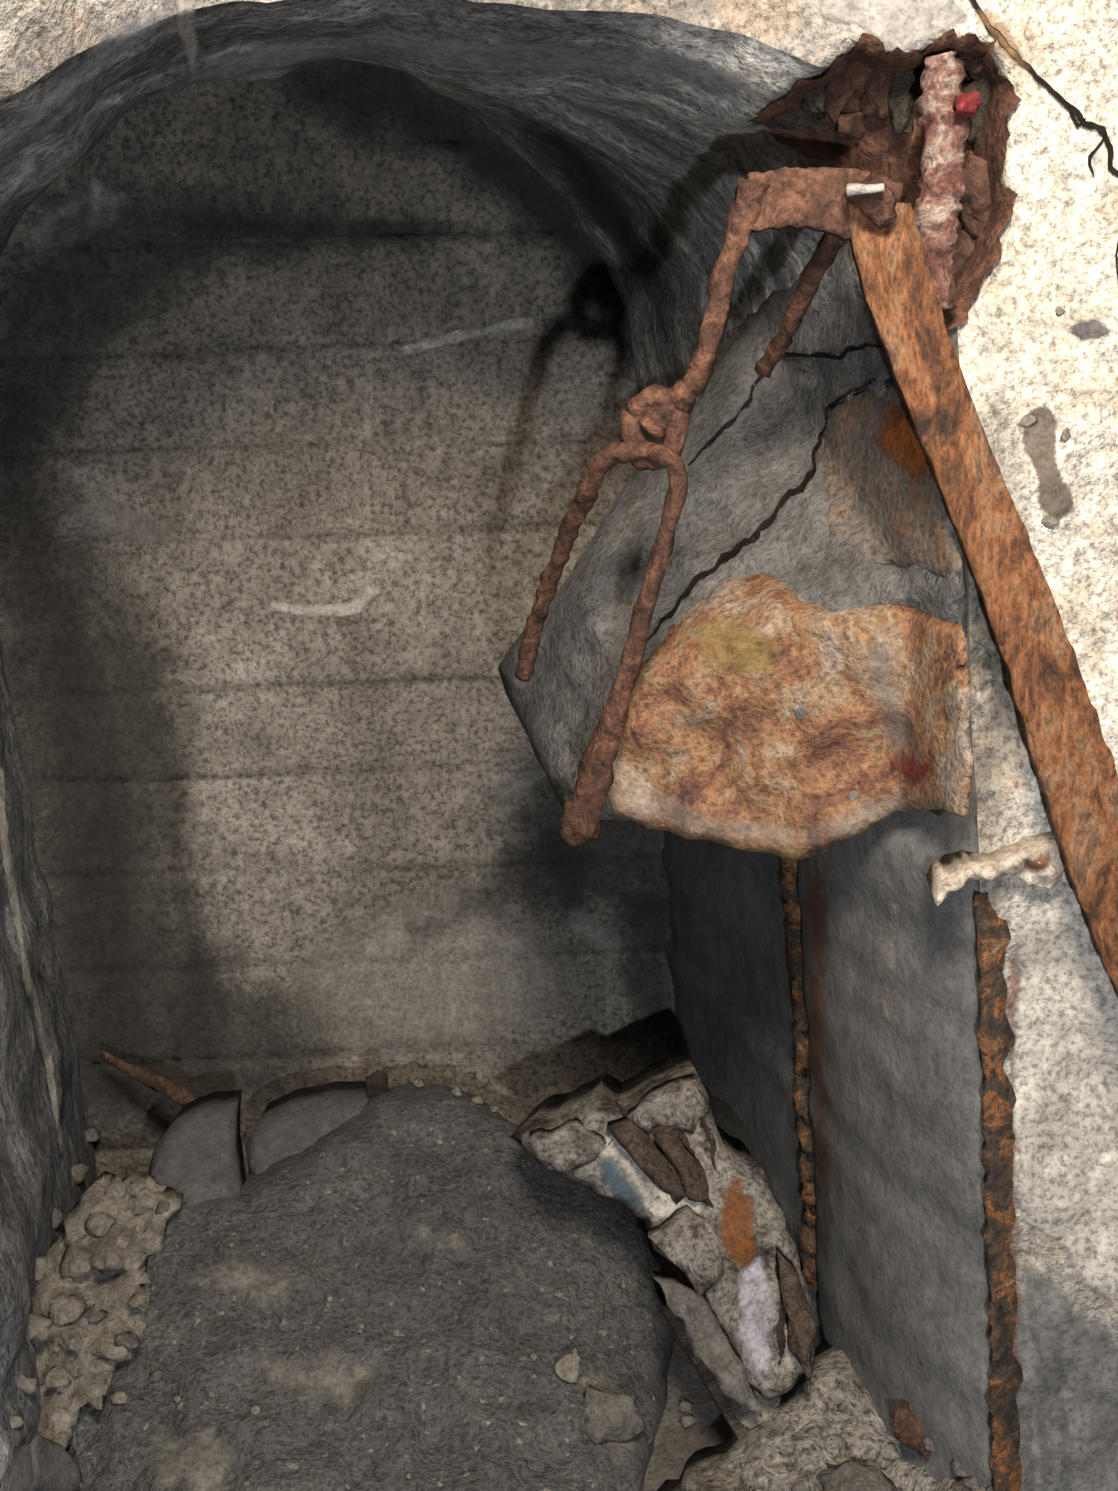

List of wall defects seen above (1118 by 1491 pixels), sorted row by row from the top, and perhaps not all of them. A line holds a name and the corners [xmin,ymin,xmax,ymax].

spalling [751,0,1022,330]
crack [970,0,1118,178]
crack [1110,242,1118,276]
corrosion [608,573,973,860]
corrosion [1009,963,1021,1054]